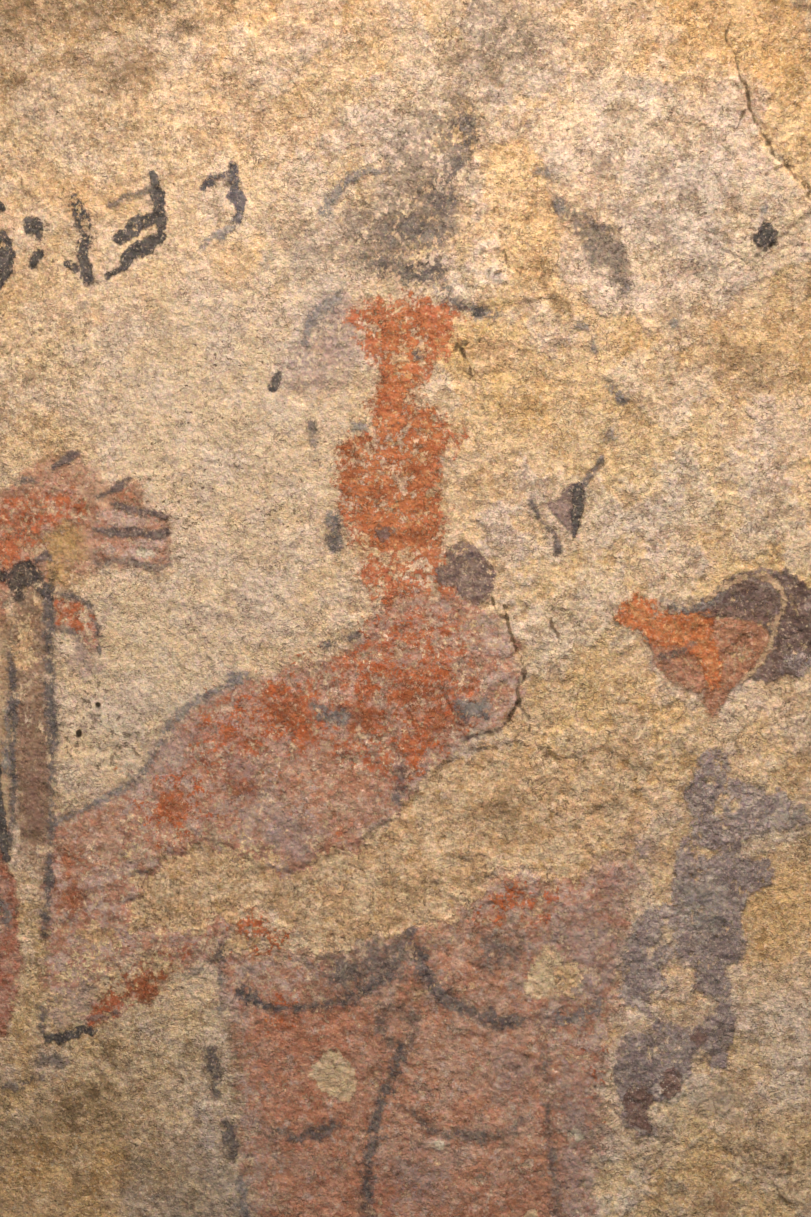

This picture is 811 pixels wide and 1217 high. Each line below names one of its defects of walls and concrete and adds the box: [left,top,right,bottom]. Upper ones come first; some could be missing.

crack [725,22,811,200]
crack [491,596,530,731]